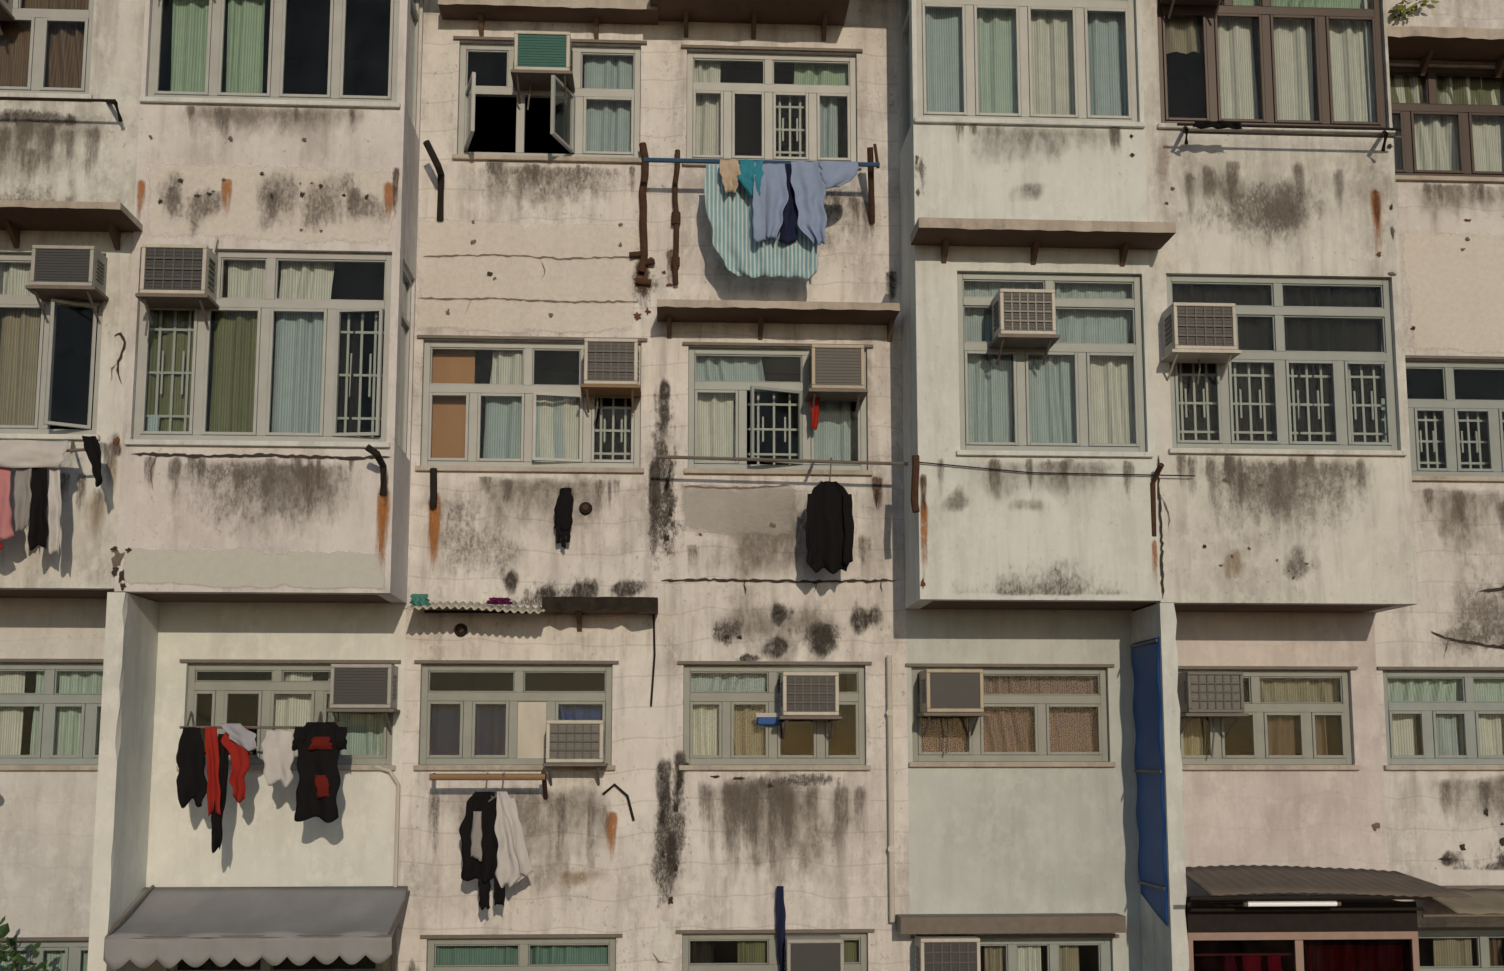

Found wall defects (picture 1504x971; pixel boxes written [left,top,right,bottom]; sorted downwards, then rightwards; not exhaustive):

water stain [0,110,99,169]
water stain [1159,147,1307,240]
rust [1371,190,1381,257]
rust [377,471,389,549]
rust [428,495,441,551]
water stain [1178,455,1365,516]
crack [1479,585,1504,593]
crack [1431,631,1504,656]
rust [606,812,617,849]
water stain [653,753,864,905]